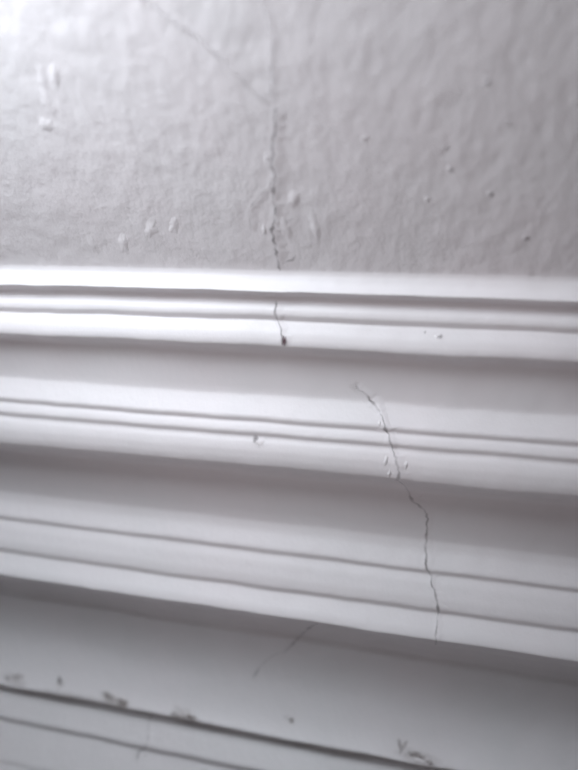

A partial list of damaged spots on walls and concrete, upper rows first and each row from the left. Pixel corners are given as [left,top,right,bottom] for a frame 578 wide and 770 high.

crack [244,0,300,271]
crack [269,299,292,345]
crack [354,382,449,645]
crack [249,623,323,683]